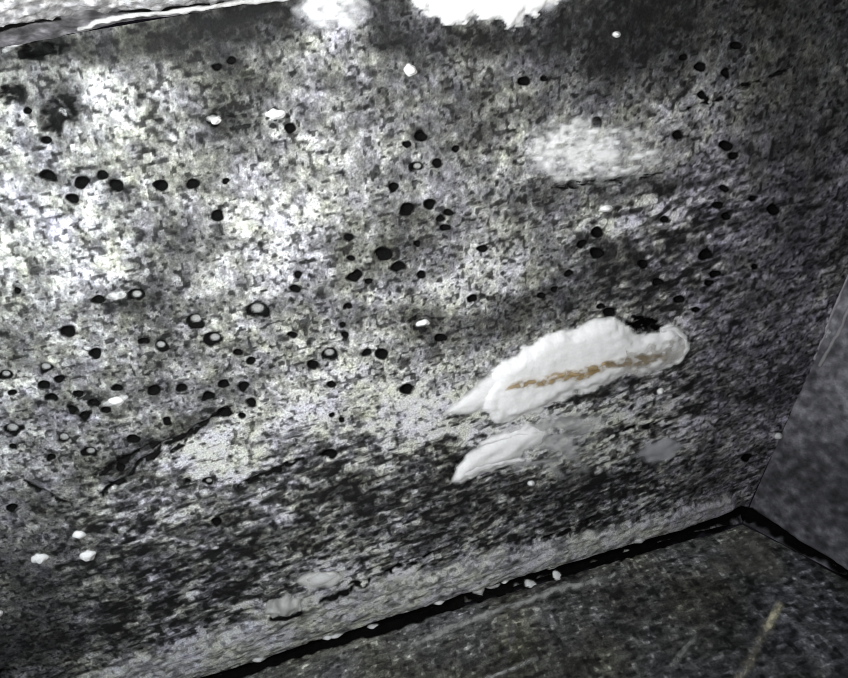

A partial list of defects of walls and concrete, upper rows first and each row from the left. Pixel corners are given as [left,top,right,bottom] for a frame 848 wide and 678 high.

water stain [444,317,690,482]
corrosion [508,355,662,389]
crack [94,405,232,497]